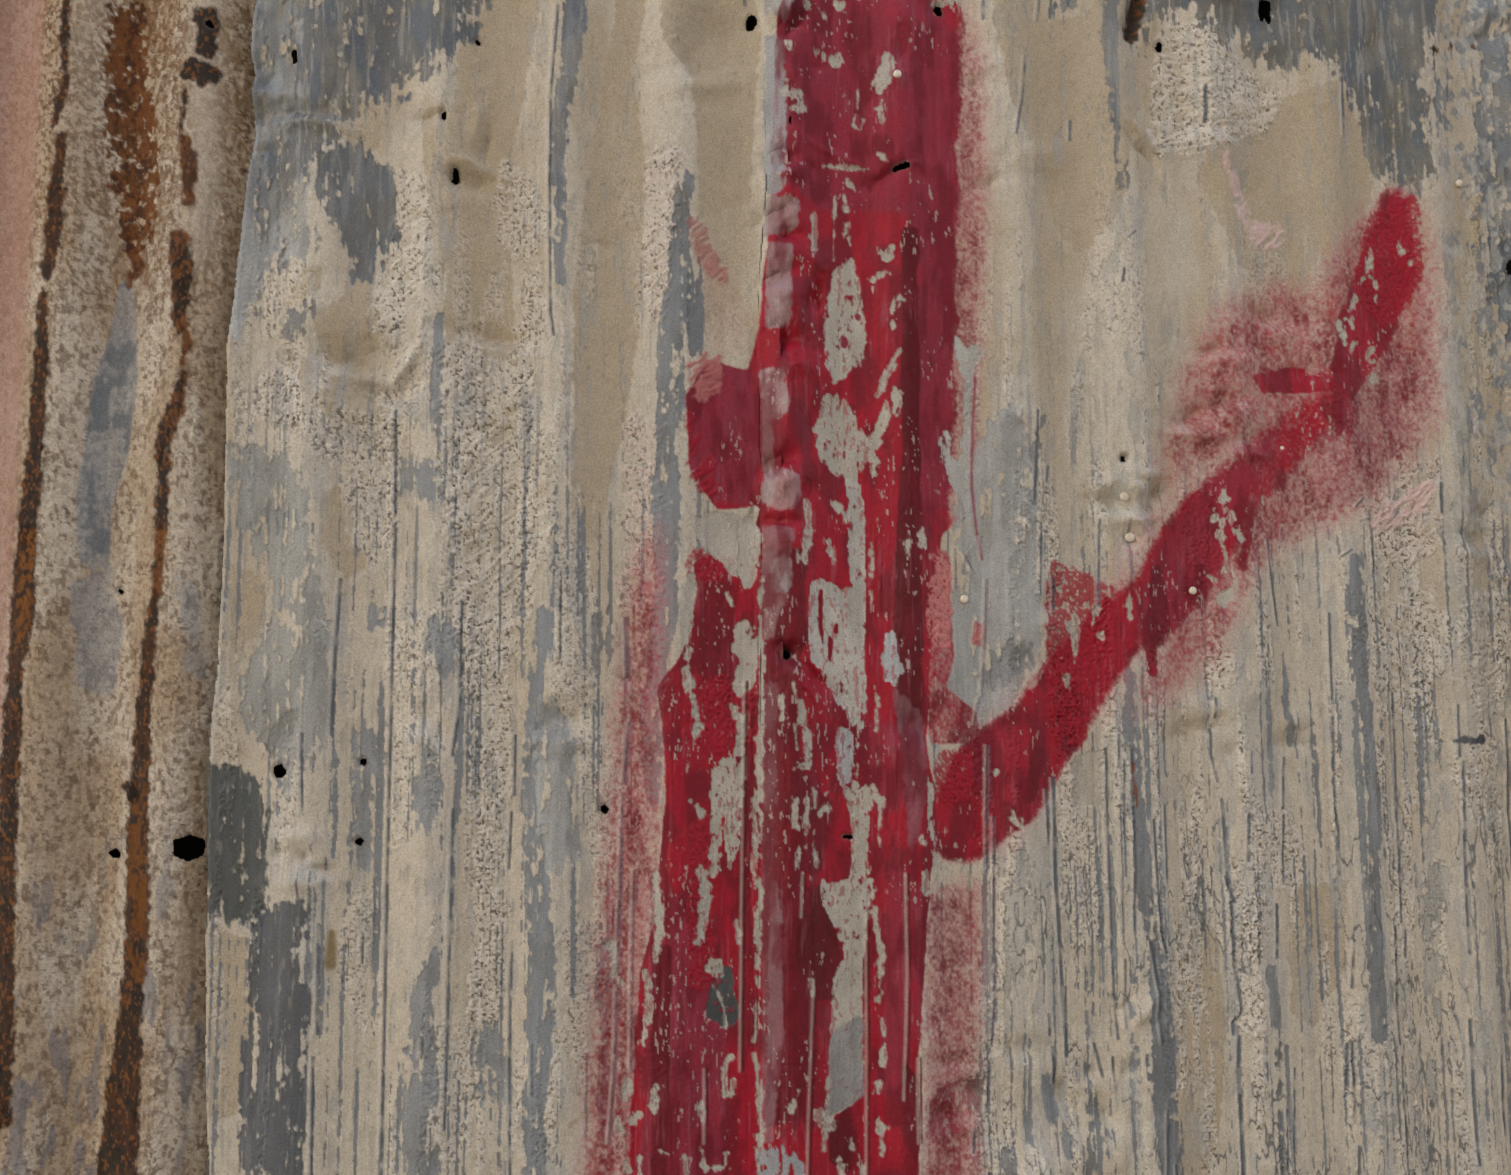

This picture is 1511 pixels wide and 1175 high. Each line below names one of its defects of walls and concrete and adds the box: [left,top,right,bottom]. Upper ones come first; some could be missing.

peeling [171,0,494,344]
peeling [852,51,897,132]
peeling [76,281,141,574]
rust [94,1,225,1175]
peeling [176,440,335,1175]
peeling [347,720,390,873]
peeling [650,151,907,1175]
peeling [1062,603,1106,690]
peeling [401,946,443,1175]
peeling [469,745,582,1175]
peeling [602,870,667,1048]
peeling [613,1078,661,1138]